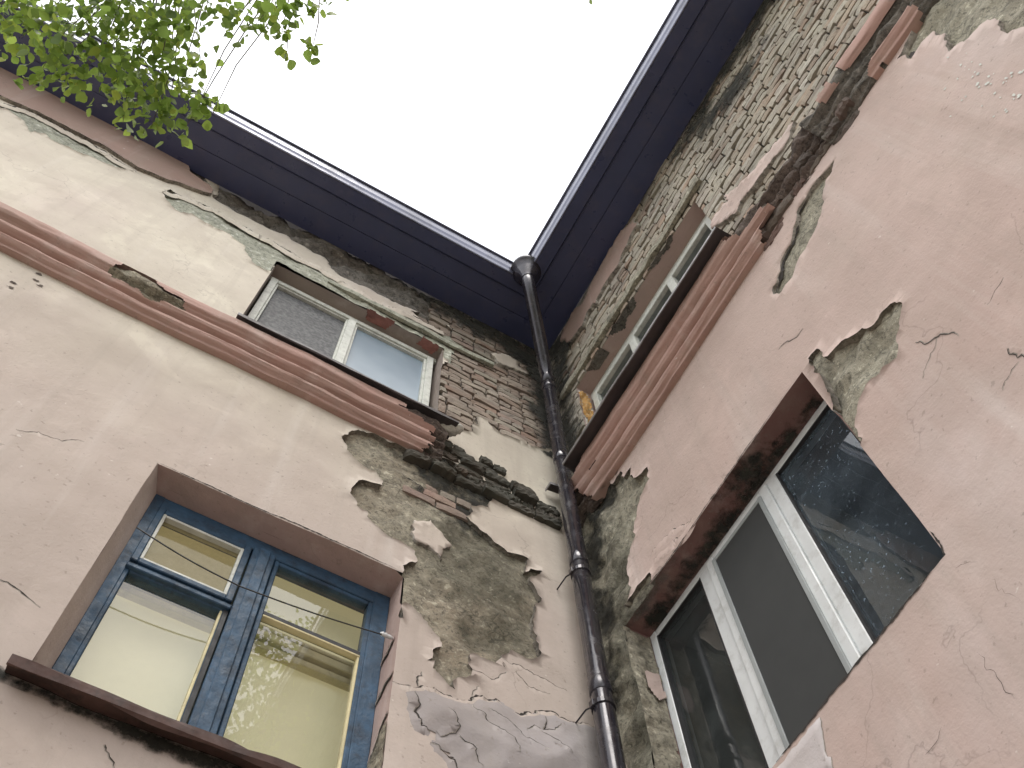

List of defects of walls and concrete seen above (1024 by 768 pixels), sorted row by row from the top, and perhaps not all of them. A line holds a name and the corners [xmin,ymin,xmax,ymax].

spalling [160,434,539,686]